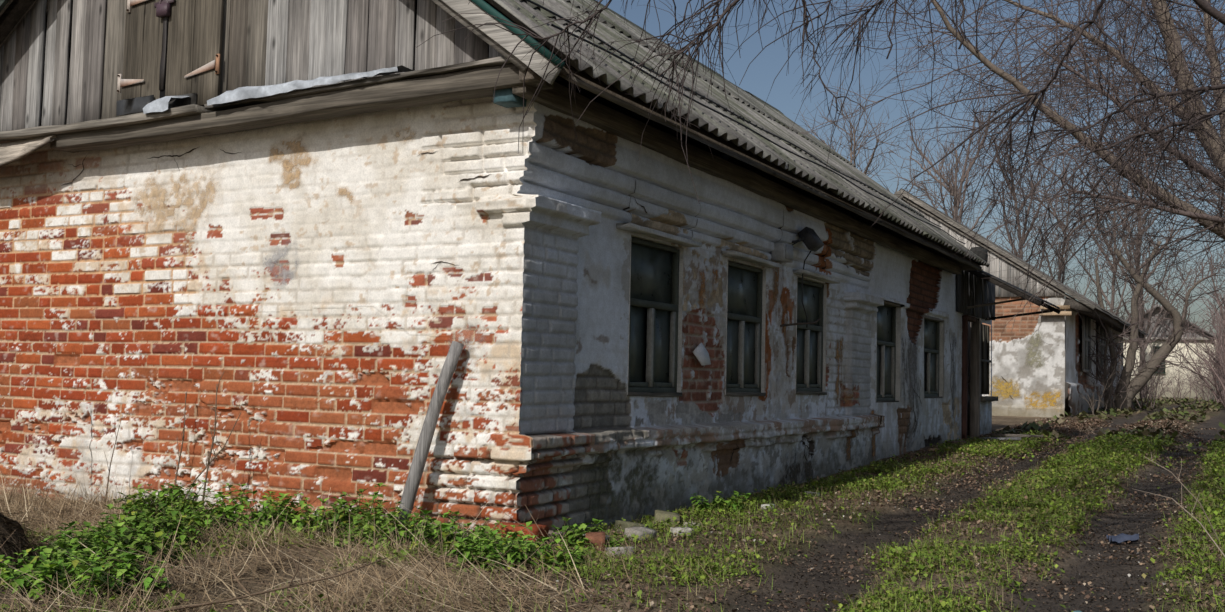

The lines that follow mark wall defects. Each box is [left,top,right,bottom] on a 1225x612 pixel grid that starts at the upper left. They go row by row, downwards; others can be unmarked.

flaking render [535,114,618,168]
peeling [0,186,532,533]
flaking render [565,209,758,532]
flaking render [906,259,943,345]
flaking render [982,293,1057,343]
water stain [1026,334,1042,368]